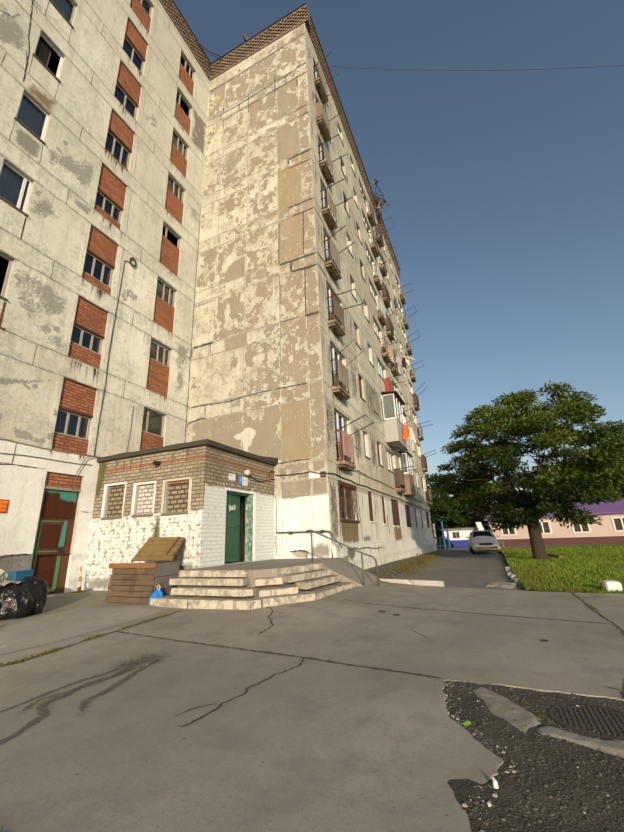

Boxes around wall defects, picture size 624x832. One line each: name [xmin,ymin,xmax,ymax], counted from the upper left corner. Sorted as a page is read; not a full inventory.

peeling [188,24,339,537]
peeling [176,345,204,390]
crack [175,658,304,727]
spalling [473,687,624,758]